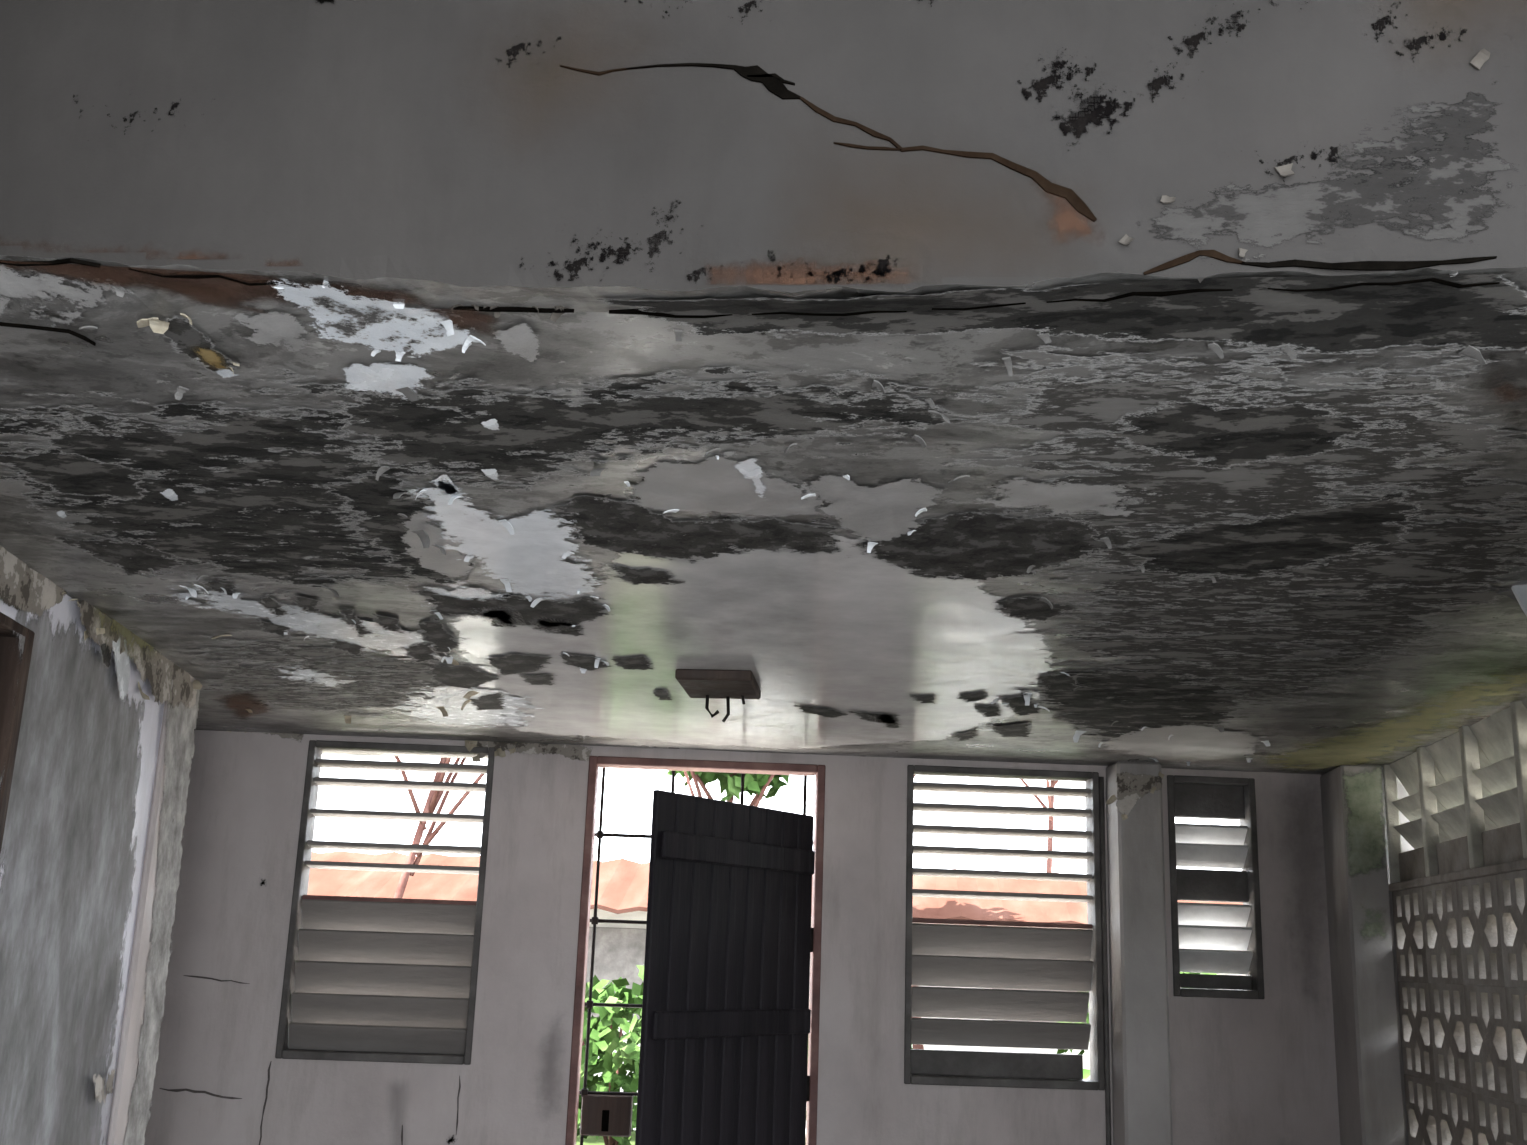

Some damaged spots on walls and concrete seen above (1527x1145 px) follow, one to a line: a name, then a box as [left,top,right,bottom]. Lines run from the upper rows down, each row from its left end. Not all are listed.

water stain [732,0,763,22]
water stain [1366,2,1467,62]
water stain [495,37,561,68]
water stain [1017,0,1277,148]
water stain [73,95,181,135]
crack [560,63,1097,222]
spalling [0,258,101,268]
crack [1143,250,1497,275]
peeling [0,262,1527,1145]
crack [183,975,250,984]
crack [159,1061,272,1145]